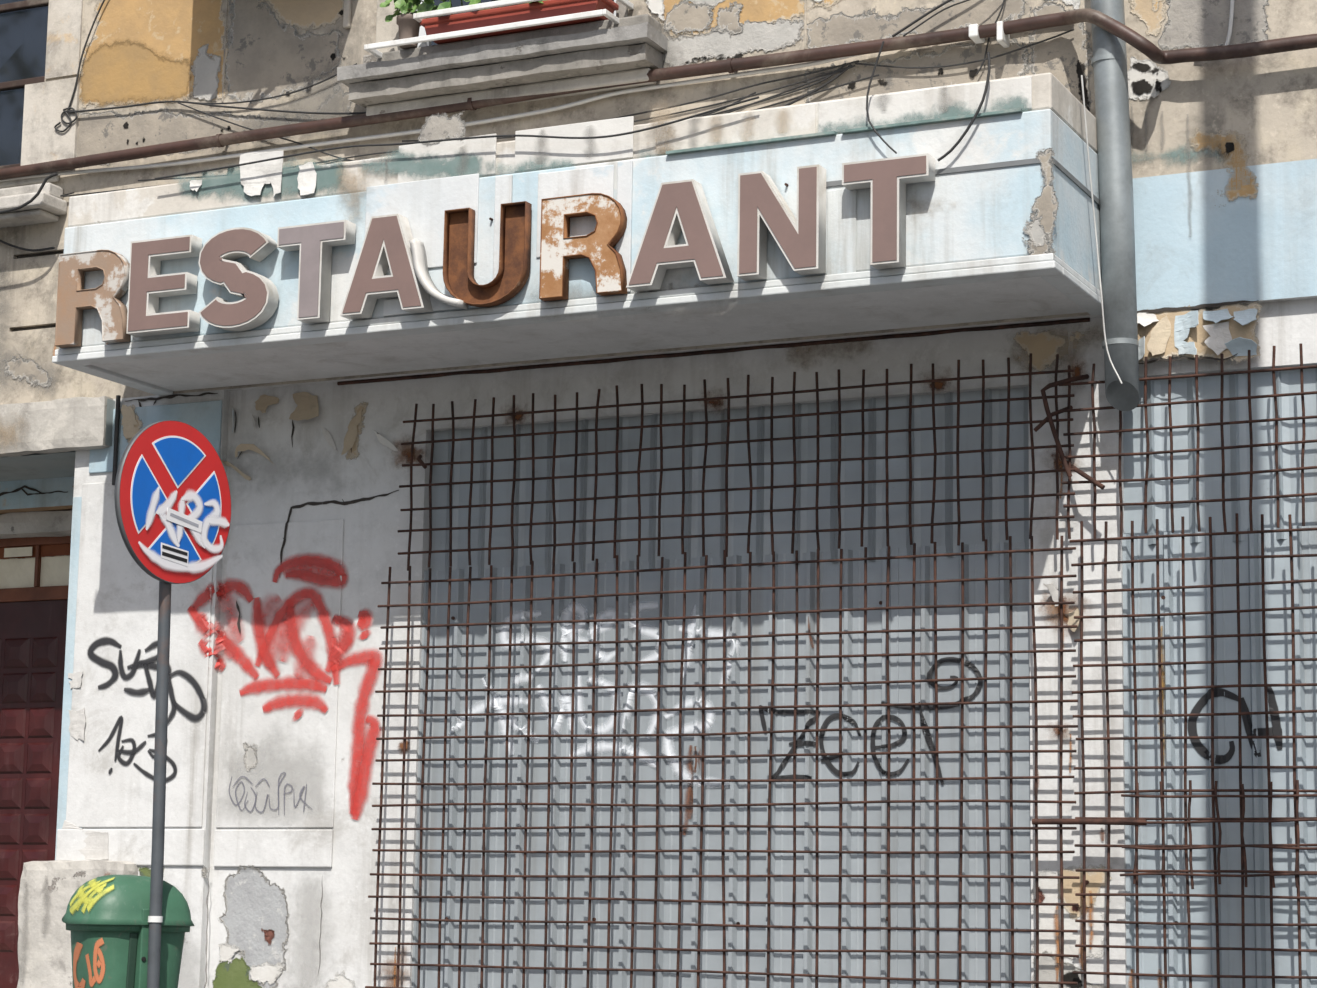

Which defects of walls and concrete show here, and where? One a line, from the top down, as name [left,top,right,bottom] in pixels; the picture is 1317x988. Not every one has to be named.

flaking render [76,0,352,201]
flaking render [662,0,1093,112]
flaking render [1127,0,1271,100]
flaking render [1022,148,1059,261]
flaking render [1188,127,1259,206]
peeling [1137,302,1262,365]
crack [0,485,67,496]
crack [280,490,399,563]
flaking render [212,865,289,988]
peeling [1031,865,1111,988]